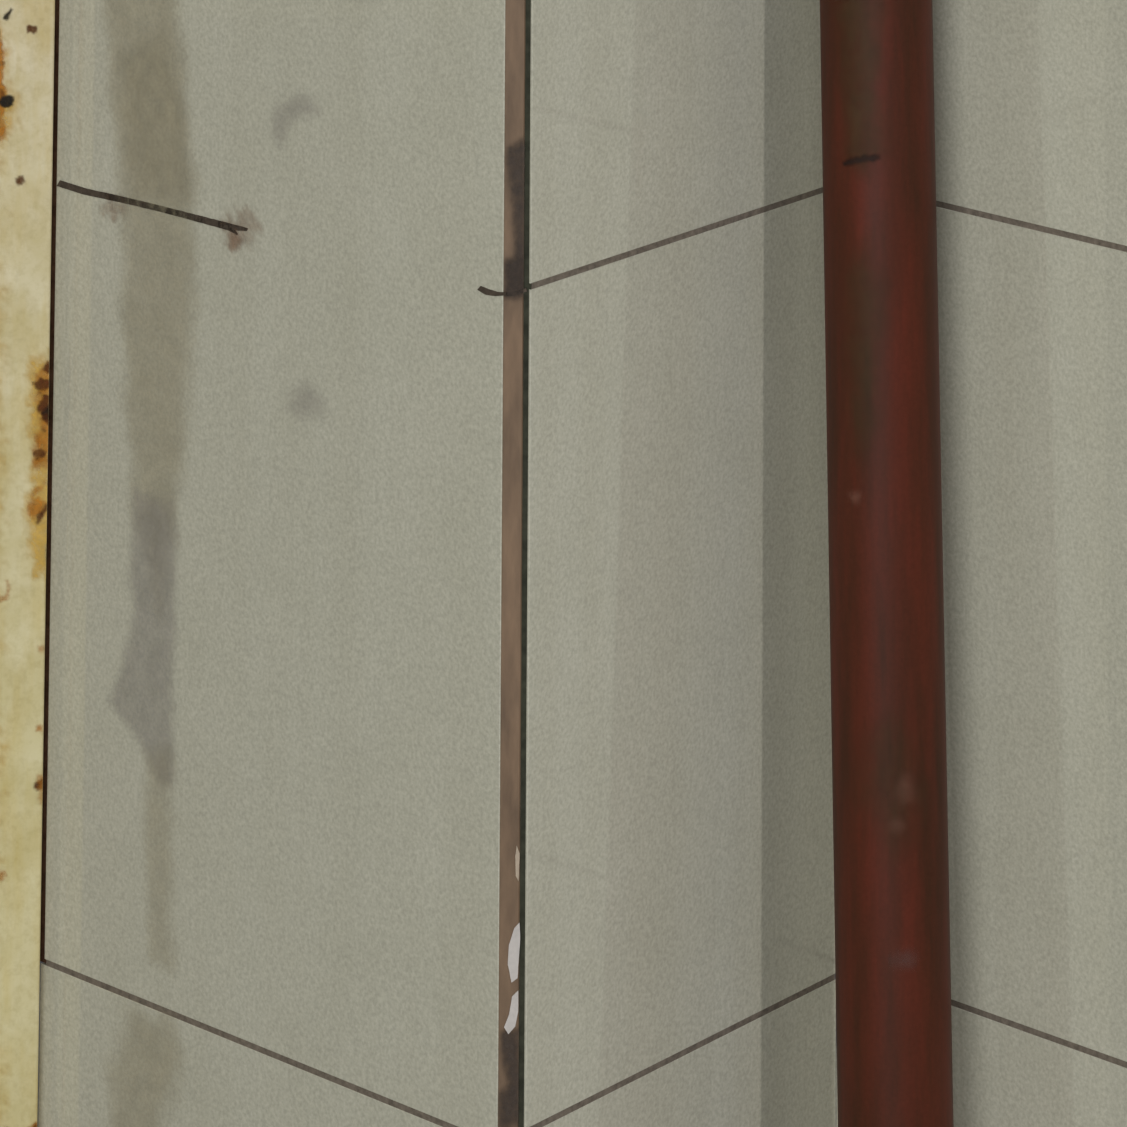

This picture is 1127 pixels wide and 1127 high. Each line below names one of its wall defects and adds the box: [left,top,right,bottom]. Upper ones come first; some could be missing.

rust [0,40,14,137]
crack [57,180,248,235]
rust [29,362,49,577]
peeling [504,923,520,1034]